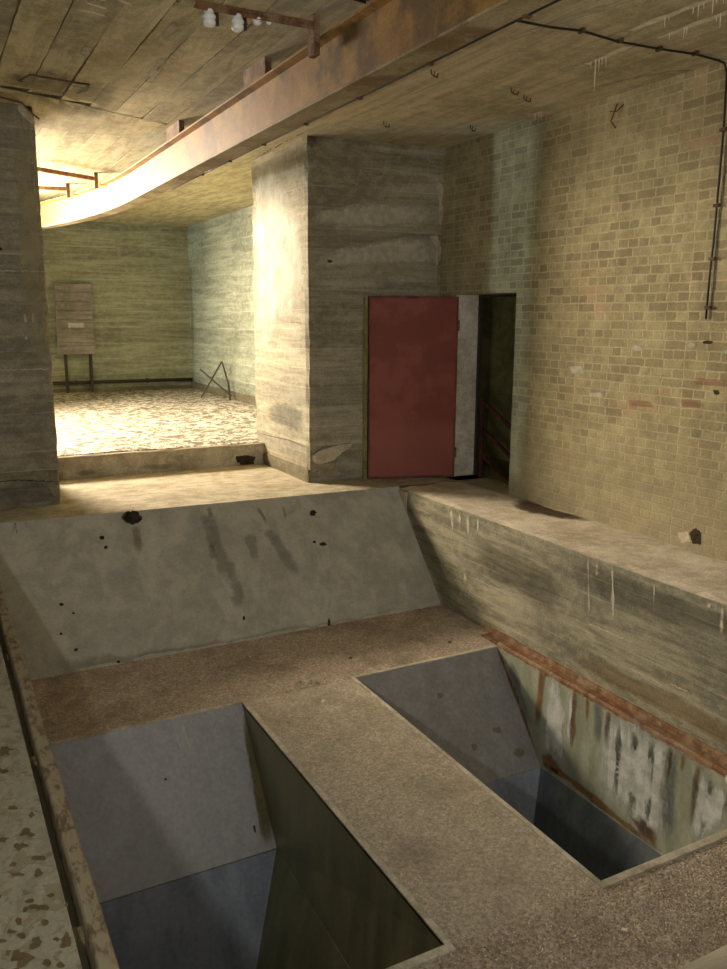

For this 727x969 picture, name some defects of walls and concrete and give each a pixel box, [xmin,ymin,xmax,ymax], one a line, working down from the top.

spalling [312,443,352,464]
spalling [122,510,142,525]
rust [499,653,545,739]
rust [570,689,589,739]
rust [543,755,654,845]
rust [691,769,699,818]